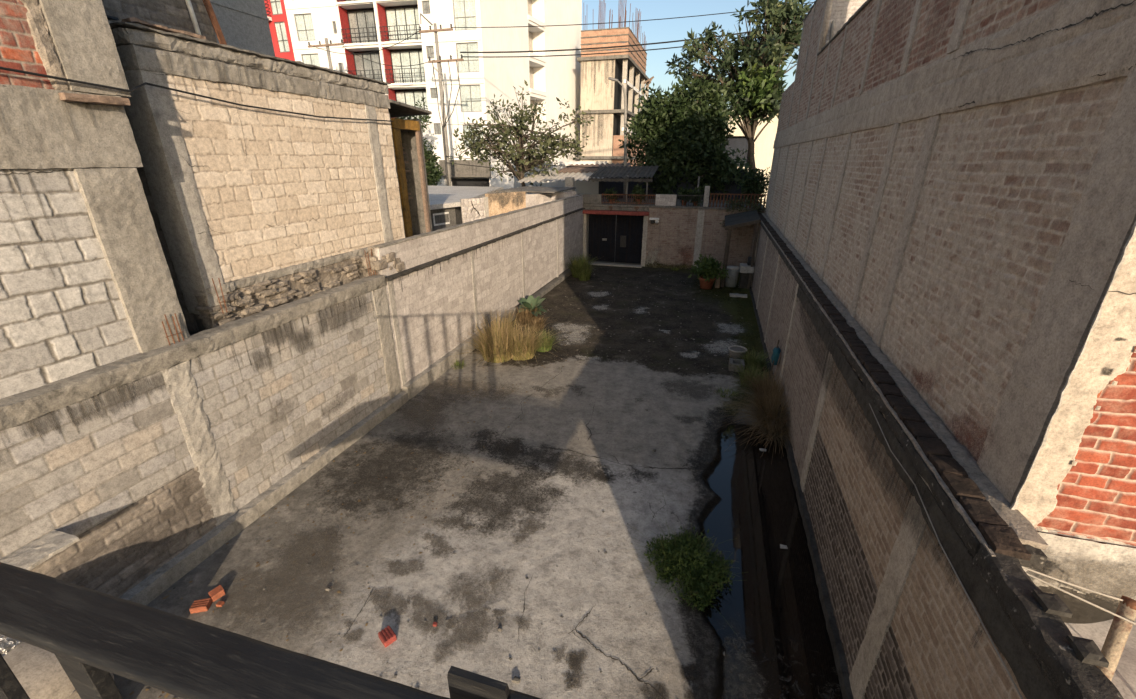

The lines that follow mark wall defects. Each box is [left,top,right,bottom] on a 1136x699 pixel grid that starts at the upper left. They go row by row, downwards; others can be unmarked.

crack [947,0,1135,62]
damp [23,374,170,437]
spalling [1010,221,1136,510]
peeling [1035,338,1136,548]
crack [568,605,664,699]